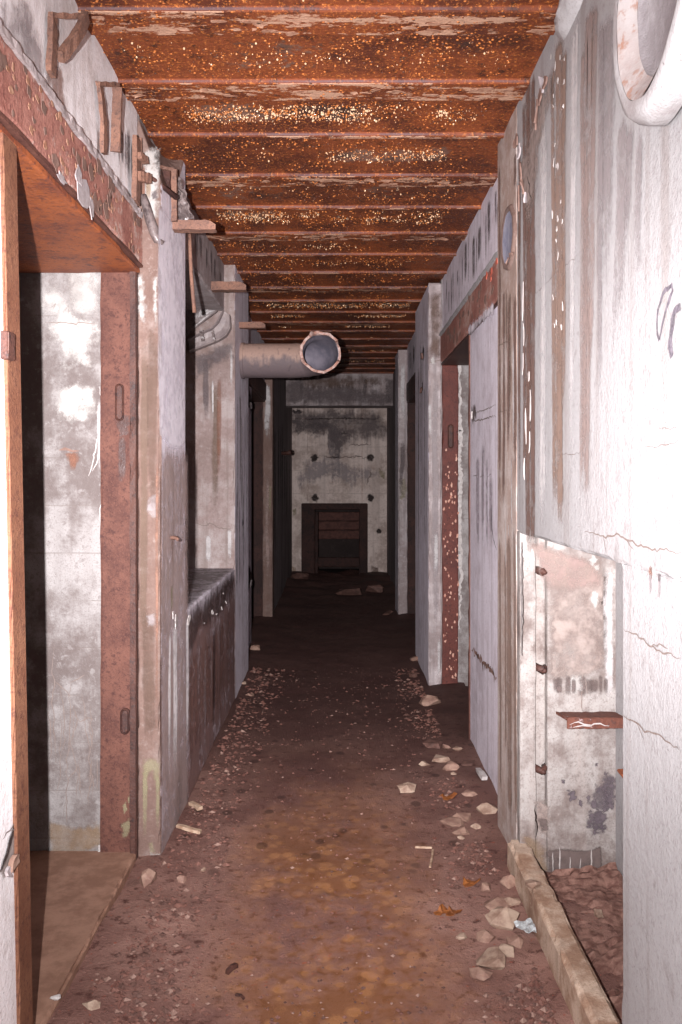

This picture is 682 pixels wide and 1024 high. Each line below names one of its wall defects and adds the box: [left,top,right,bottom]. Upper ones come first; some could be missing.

peeling [242,20,302,36]
peeling [380,15,452,36]
peeling [515,19,549,35]
peeling [350,88,438,99]
rust [139,138,178,200]
water stain [42,273,99,365]
water stain [59,385,100,476]
water stain [400,10,642,813]
crack [585,531,681,554]
peeling [520,542,606,676]
crack [624,630,678,659]
water stain [562,763,616,835]